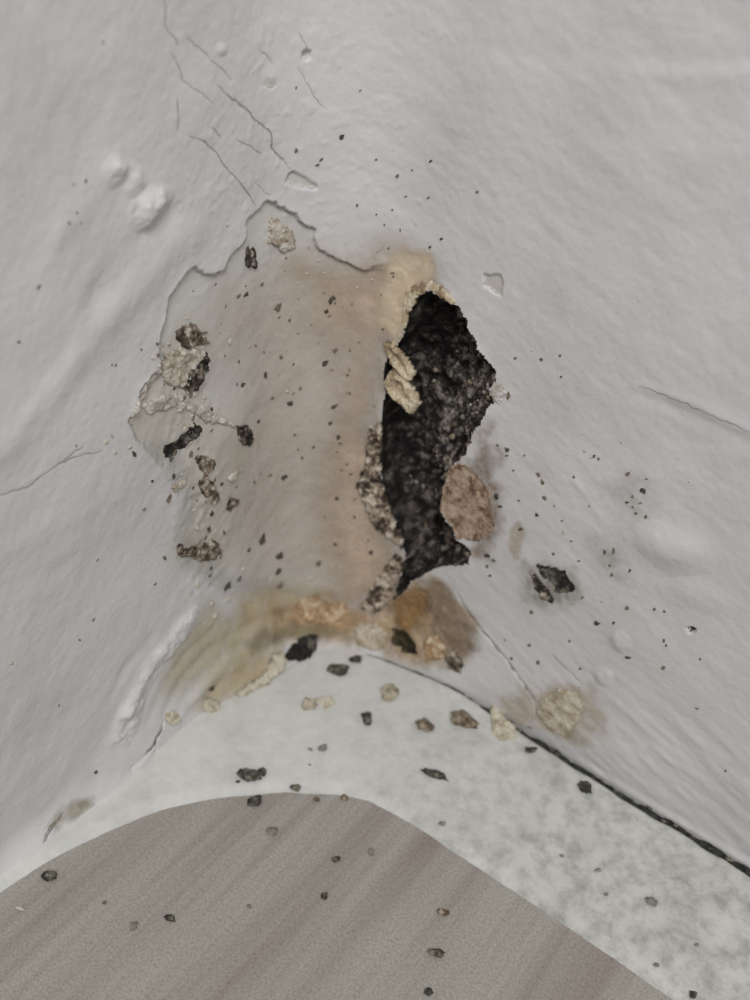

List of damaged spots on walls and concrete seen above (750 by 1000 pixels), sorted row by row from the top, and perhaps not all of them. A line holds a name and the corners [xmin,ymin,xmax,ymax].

crack [164,2,289,203]
leakage [319,237,443,371]
crack [0,447,99,495]
peeling [104,201,507,674]
leakage [323,368,391,599]
leakage [476,444,509,520]
crack [639,386,750,433]
leakage [171,551,329,697]
peeling [235,649,287,697]